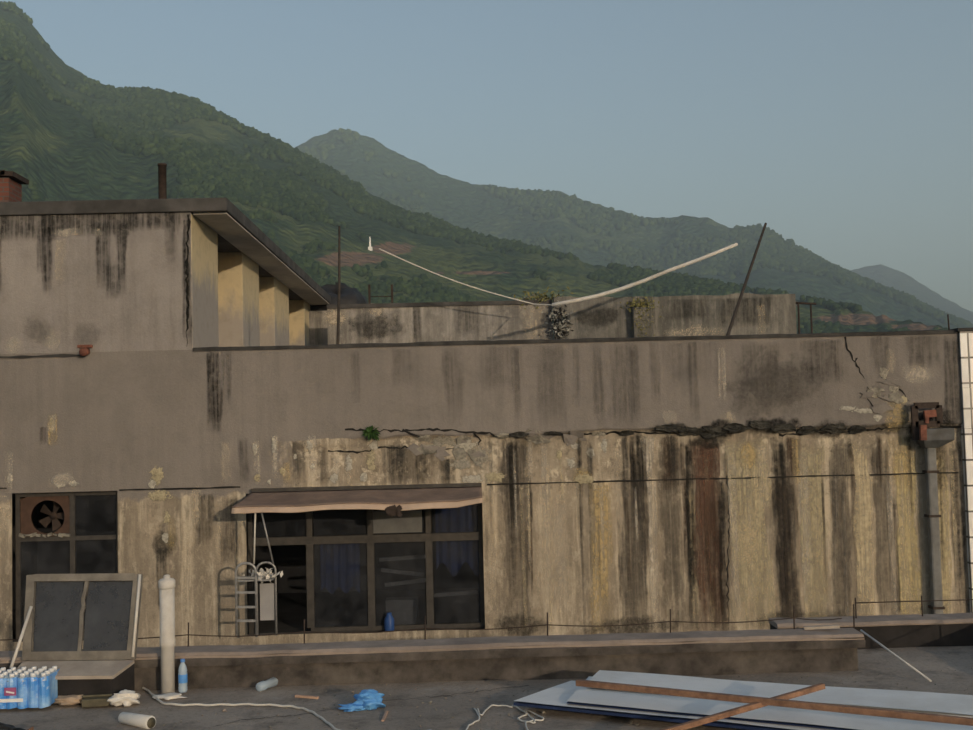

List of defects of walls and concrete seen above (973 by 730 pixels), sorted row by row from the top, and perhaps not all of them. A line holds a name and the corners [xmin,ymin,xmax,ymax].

leakage [1,212,173,284]
leakage [183,220,192,332]
crack [184,214,192,347]
peeling [148,466,173,543]
crack [328,428,513,454]
spalling [414,434,505,483]
leakage [501,444,533,594]
crack [559,429,690,437]
leakage [576,343,958,617]
crack [779,337,911,437]
spalling [839,396,882,422]
leakage [936,445,969,604]